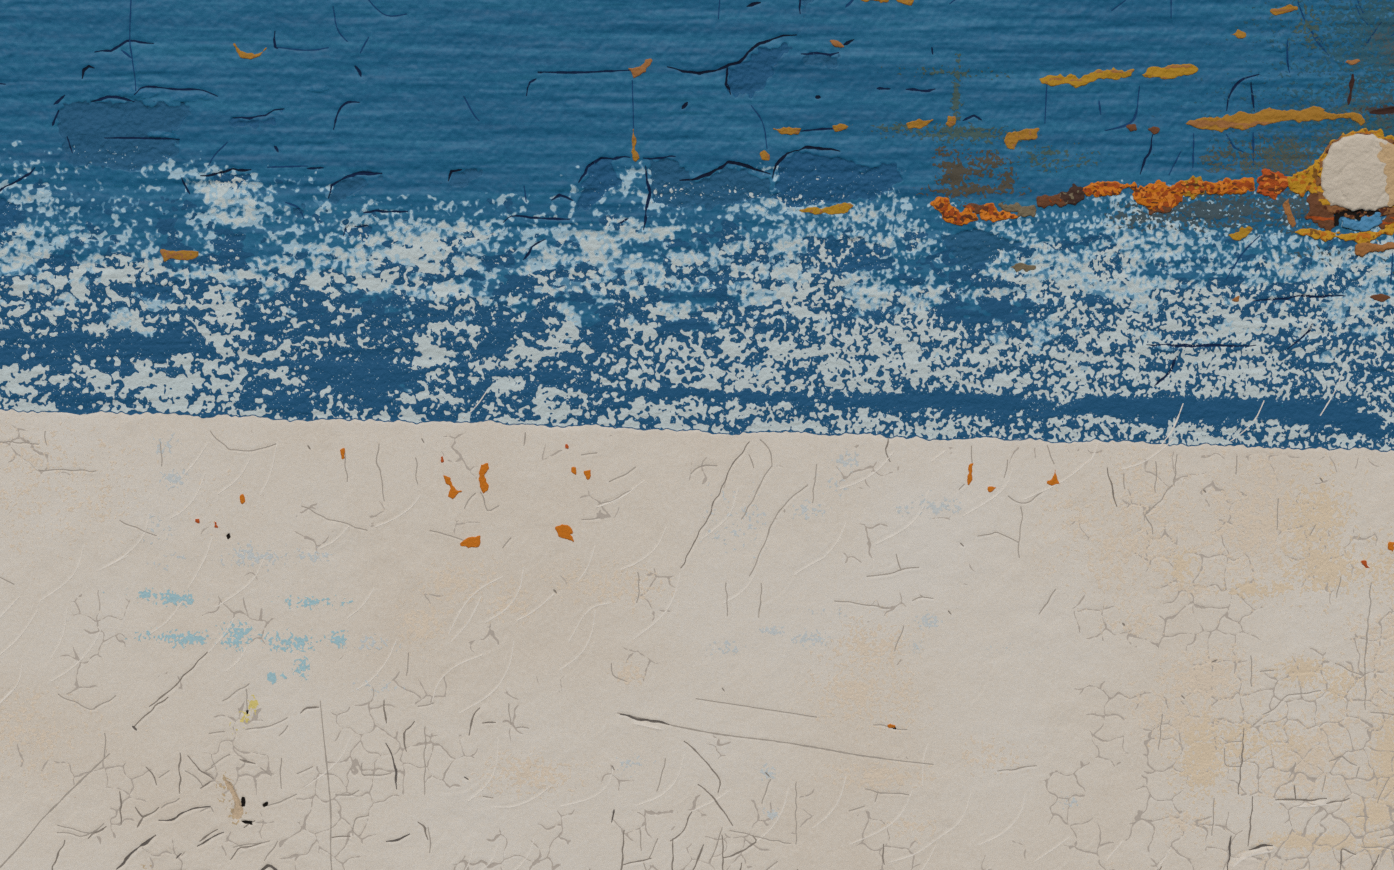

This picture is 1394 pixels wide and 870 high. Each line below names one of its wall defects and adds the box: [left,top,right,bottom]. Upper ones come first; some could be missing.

peeling [233,43,267,59]
crack [273,0,407,130]
peeling [1039,64,1198,88]
crack [1098,0,1394,175]
crack [503,0,854,260]
rust [862,0,1394,274]
crack [343,209,408,236]
crack [295,434,511,555]
peeling [441,456,462,499]
peeling [479,463,489,494]
peeling [460,535,481,548]
peeling [555,524,574,542]